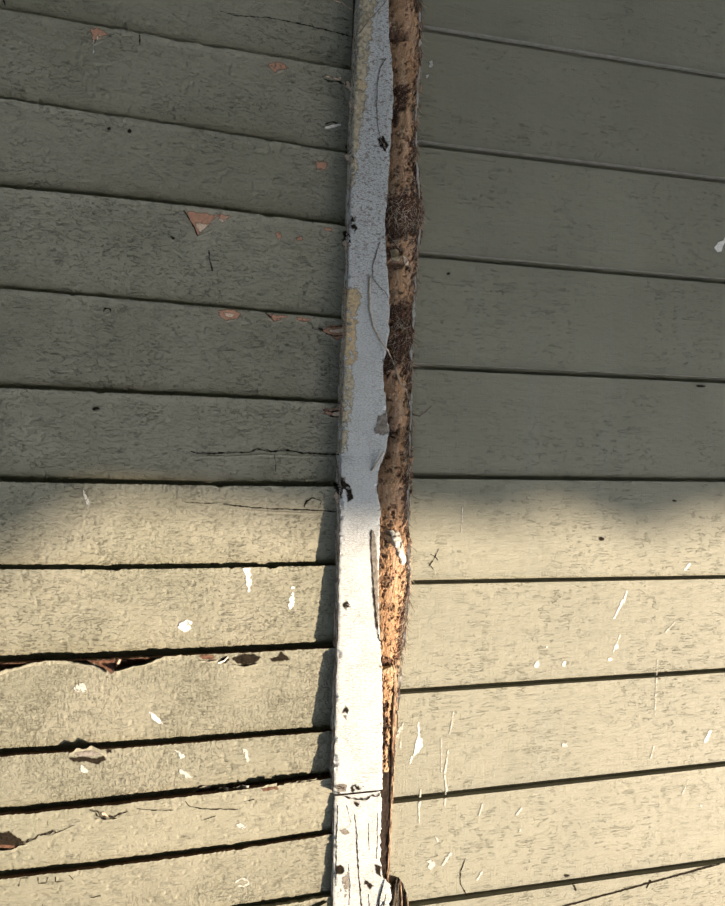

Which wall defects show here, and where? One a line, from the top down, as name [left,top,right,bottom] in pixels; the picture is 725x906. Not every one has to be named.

peeling [184,211,230,238]
peeling [217,309,241,323]
peeling [318,287,361,454]
crack [191,448,339,471]
crack [185,497,336,515]
peeling [0,655,181,675]
hole [199,652,290,668]
peeling [69,746,111,764]
crack [137,799,254,820]
peeling [0,825,75,852]
crack [318,805,386,906]
crack [564,863,720,906]